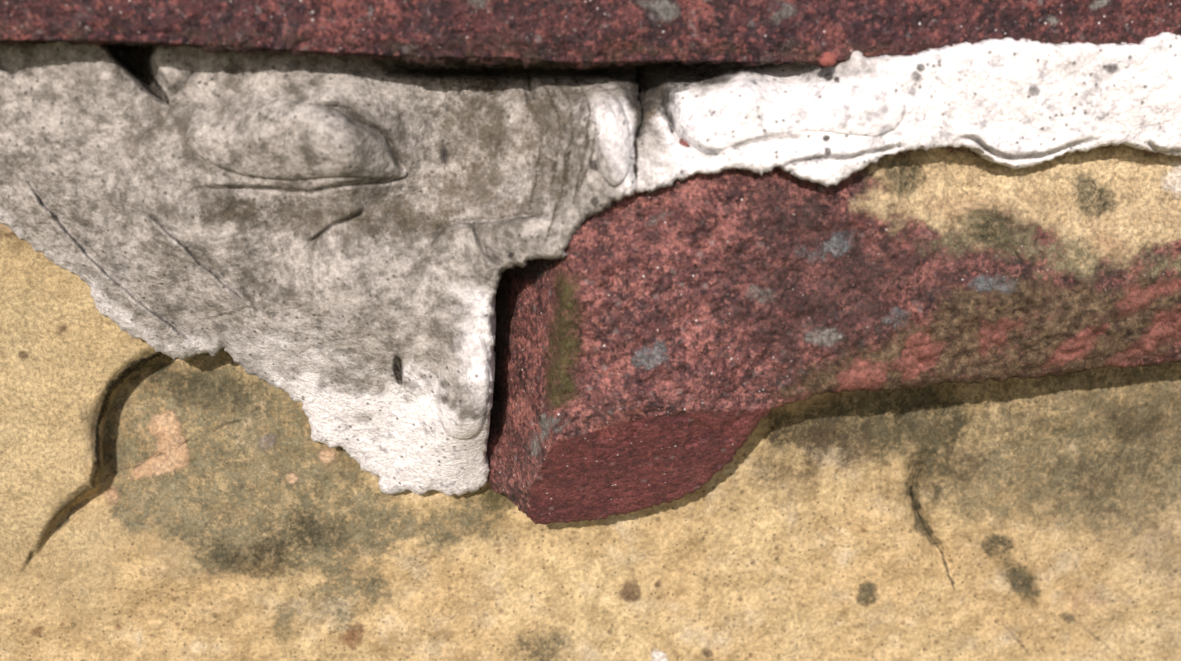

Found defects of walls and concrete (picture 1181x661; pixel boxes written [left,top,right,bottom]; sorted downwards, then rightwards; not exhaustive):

crack [92,355,189,487]
damp [129,363,247,408]
damp [768,388,965,500]
crack [905,387,954,588]
damp [217,512,340,576]
damp [1006,563,1039,597]